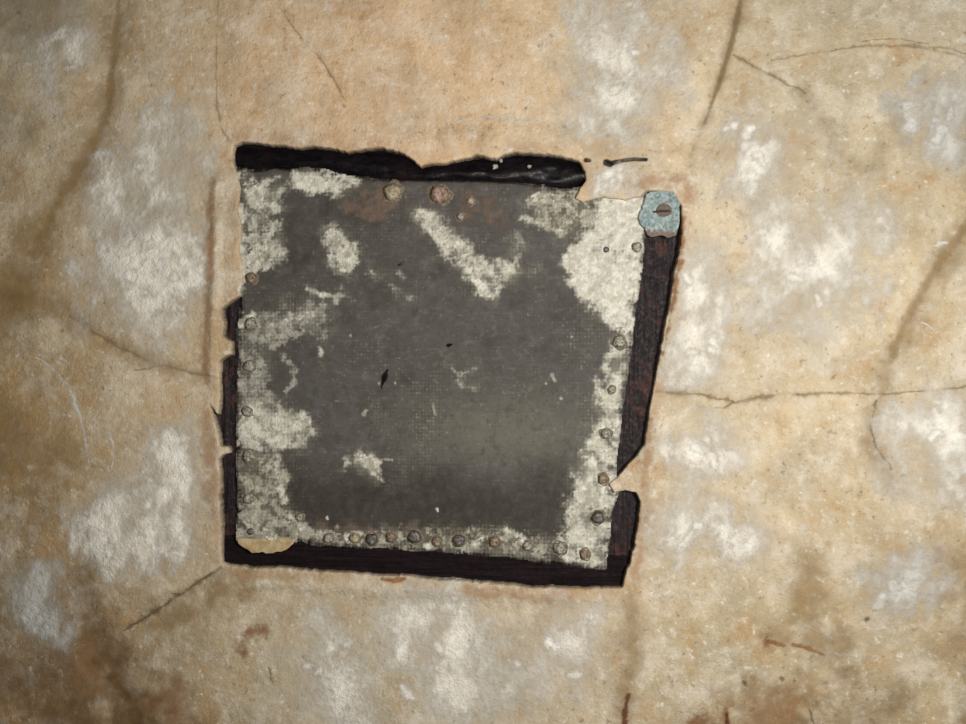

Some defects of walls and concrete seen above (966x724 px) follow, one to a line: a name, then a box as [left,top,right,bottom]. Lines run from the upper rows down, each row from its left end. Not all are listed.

leakage [80,93,212,345]
peeling [237,167,361,290]
leakage [592,163,636,198]
leakage [721,117,780,199]
leakage [664,193,894,390]
leakage [66,419,202,584]
peeling [236,187,645,568]
leakage [644,423,762,569]
leakage [880,391,966,507]
leakage [15,560,74,646]
crack [128,574,211,628]
leakage [381,577,515,720]